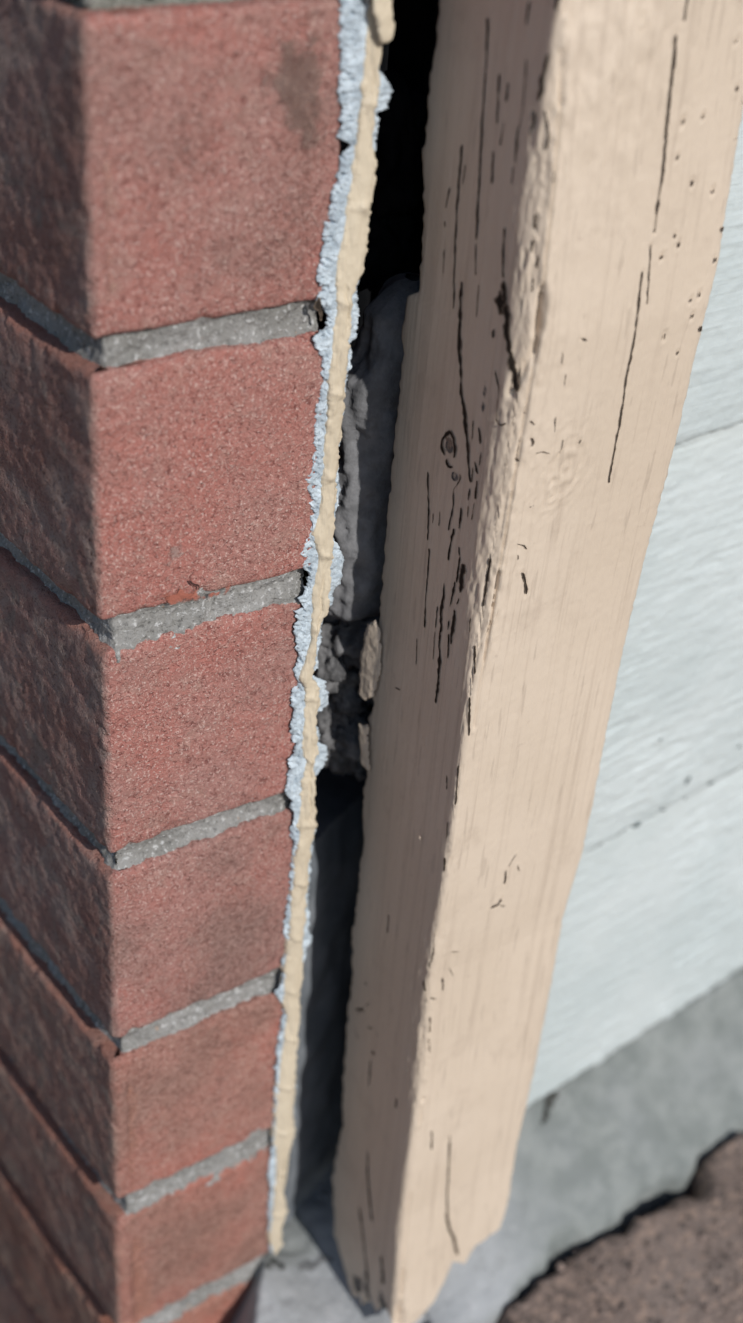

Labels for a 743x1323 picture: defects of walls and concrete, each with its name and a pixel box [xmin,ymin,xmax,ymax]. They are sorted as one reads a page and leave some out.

peeling [372,70,393,152]
crack [608,0,688,483]
peeling [345,281,360,392]
crack [416,17,528,703]
crack [515,418,581,462]
peeling [312,468,345,781]
peeling [358,620,382,700]
peeling [358,723,370,772]
peeling [302,829,317,962]
crack [359,1153,373,1280]